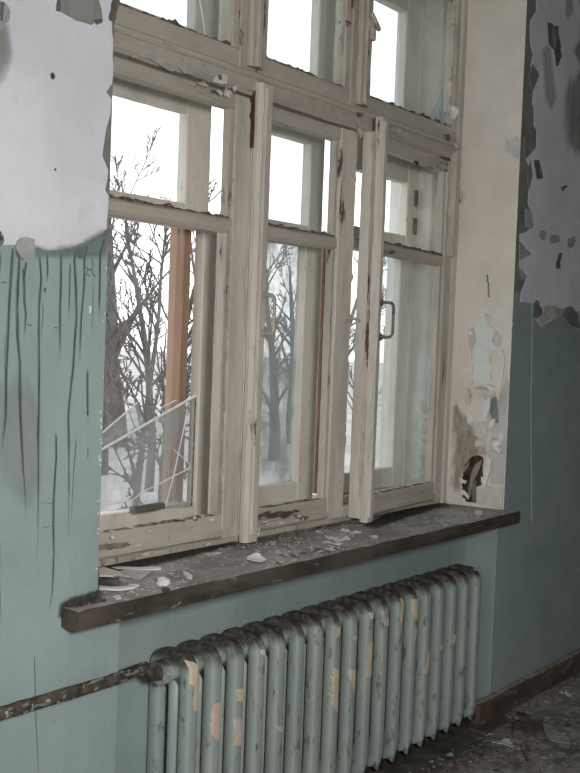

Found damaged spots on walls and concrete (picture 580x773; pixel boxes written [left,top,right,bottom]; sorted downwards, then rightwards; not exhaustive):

flaking render [0,1,10,29]
peeling [56,0,120,25]
peeling [547,23,562,66]
peeling [528,64,540,90]
peeling [502,136,543,188]
peeling [15,237,35,261]
peeling [525,209,576,269]
peeling [533,300,580,328]
peeling [464,312,509,509]